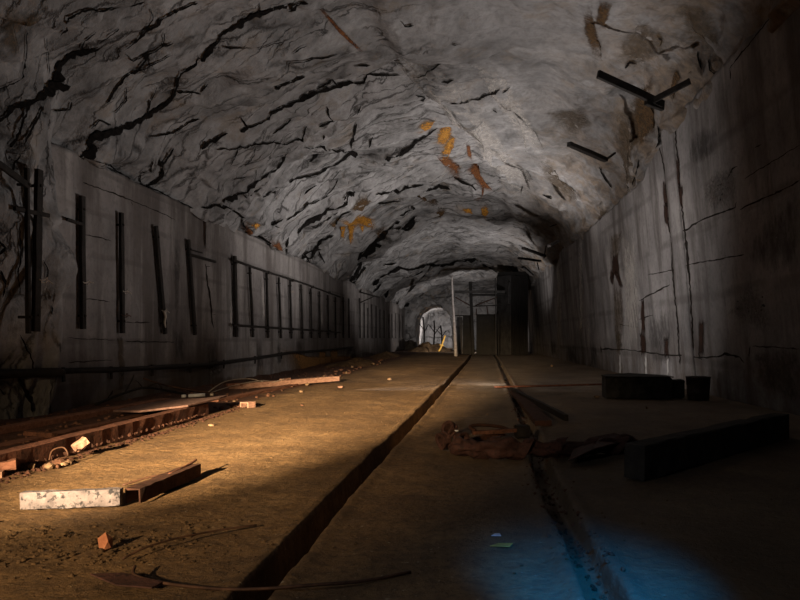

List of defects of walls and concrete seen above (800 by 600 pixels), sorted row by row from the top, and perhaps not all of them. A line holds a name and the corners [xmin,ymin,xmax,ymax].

corrosion [322,11,360,50]
corrosion [420,121,459,176]
crack [83,182,172,219]
corrosion [463,146,492,218]
corrosion [330,216,385,244]
crack [600,131,800,363]